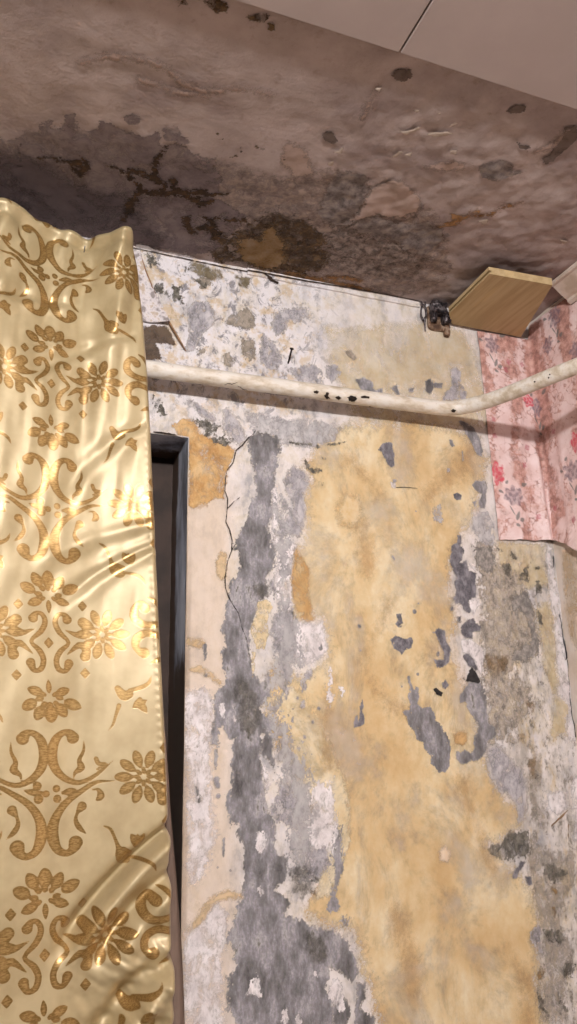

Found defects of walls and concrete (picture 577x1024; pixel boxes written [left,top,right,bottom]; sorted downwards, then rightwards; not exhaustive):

damp [0,114,452,305]
peeling [280,132,431,280]
peeling [542,126,577,164]
damp [333,327,483,401]
crack [224,426,258,668]
peeling [193,402,376,1024]
damp [183,404,577,1024]
flaking render [401,480,575,1023]